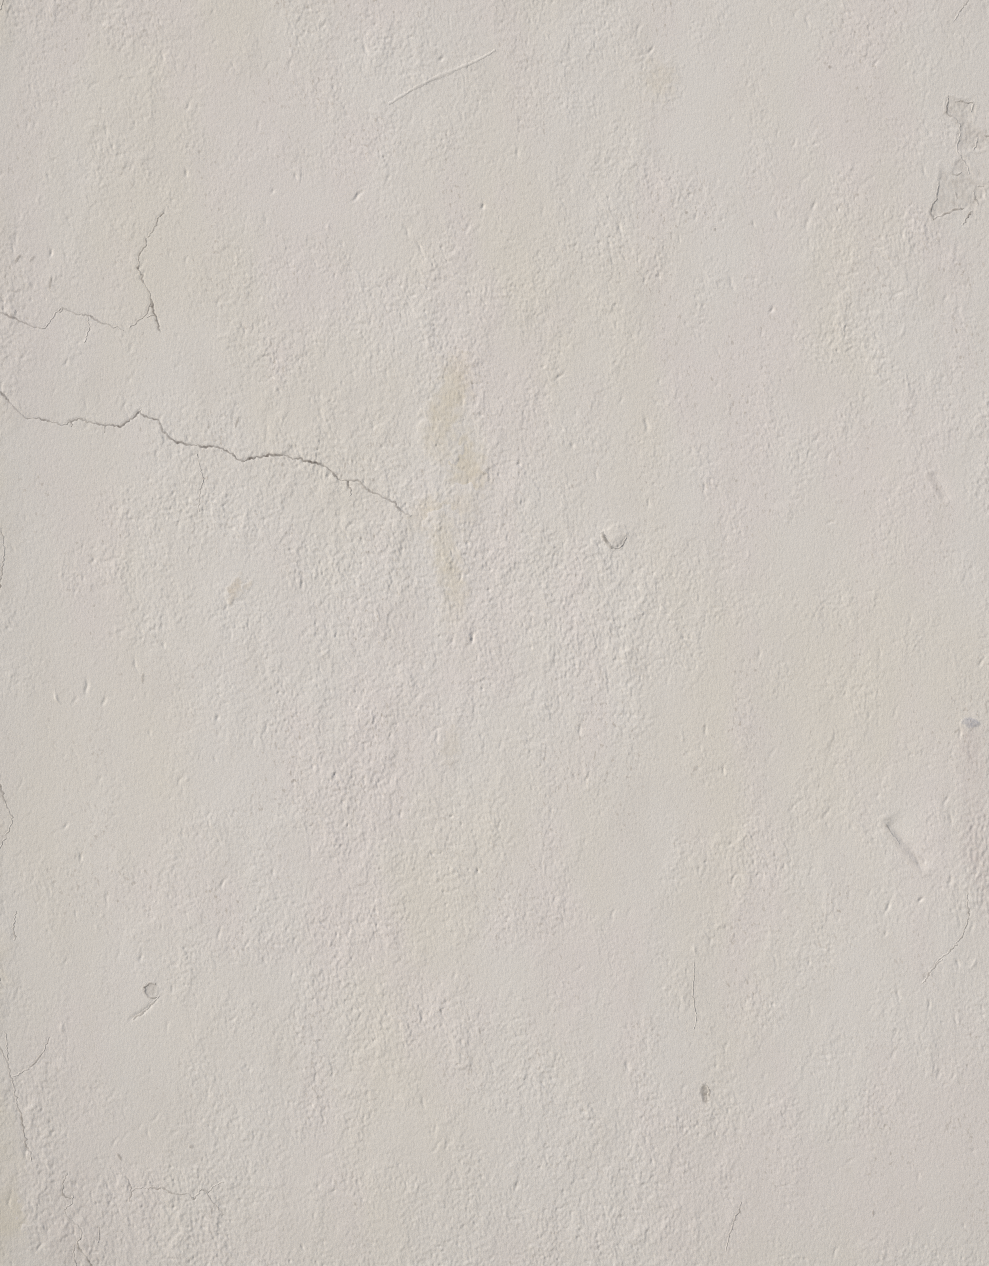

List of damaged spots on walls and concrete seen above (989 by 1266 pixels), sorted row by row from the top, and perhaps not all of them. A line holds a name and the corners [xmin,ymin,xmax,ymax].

peeling [926,94,989,226]
crack [0,212,164,342]
crack [0,391,411,516]